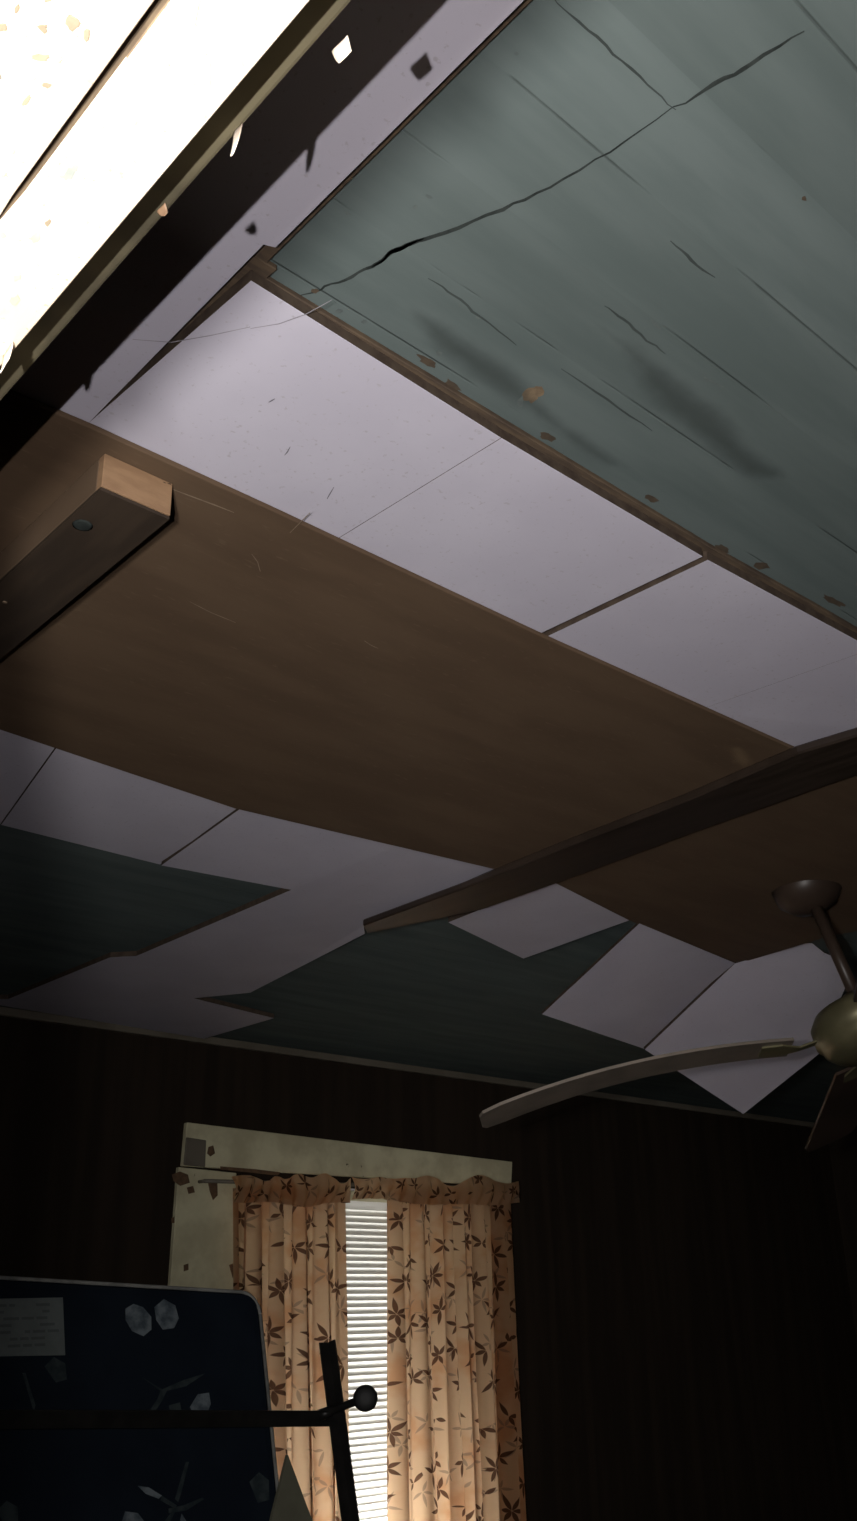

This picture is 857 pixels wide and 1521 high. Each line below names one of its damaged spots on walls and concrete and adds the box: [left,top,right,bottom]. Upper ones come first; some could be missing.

peeling [0,4,47,38]
peeling [65,14,89,42]
peeling [332,35,352,63]
peeling [230,123,243,157]
crack [301,0,804,296]
crack [428,278,516,345]
crack [605,306,666,354]
peeling [0,342,14,373]
crack [562,369,652,431]